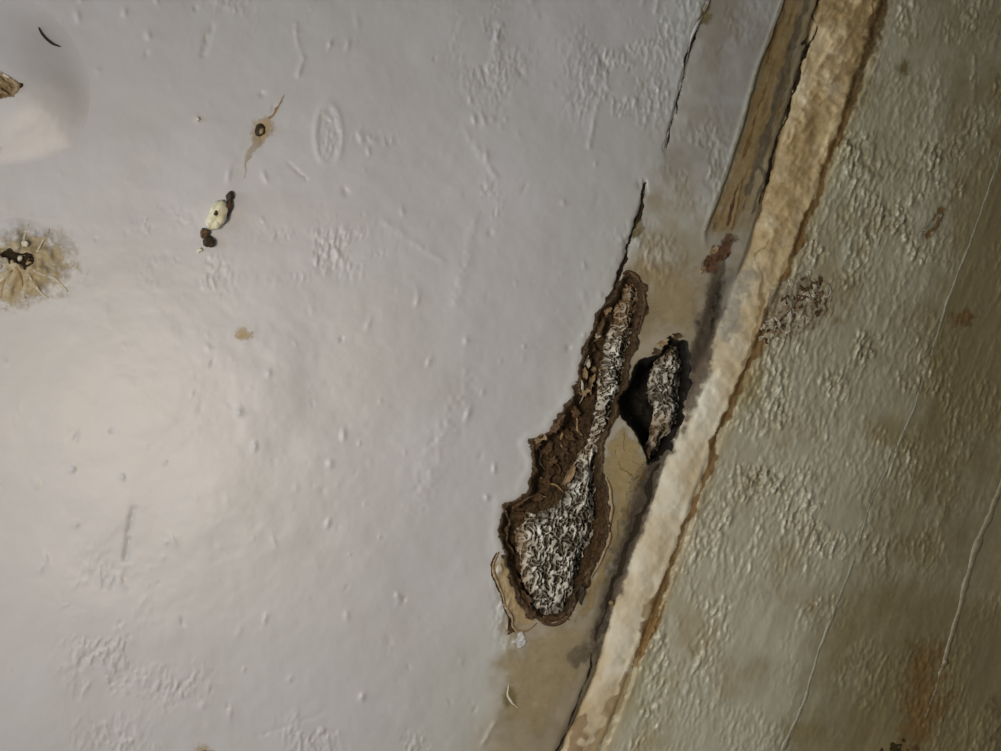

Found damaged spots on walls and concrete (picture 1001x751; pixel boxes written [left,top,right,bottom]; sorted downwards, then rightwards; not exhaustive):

rust [244,95,284,177]
crack [663,0,711,150]
crack [751,0,819,214]
crack [602,182,646,307]
rust [700,234,738,300]
peeling [758,270,832,345]
damp [568,0,888,751]
flaking render [490,270,692,648]
damp [880,645,948,751]